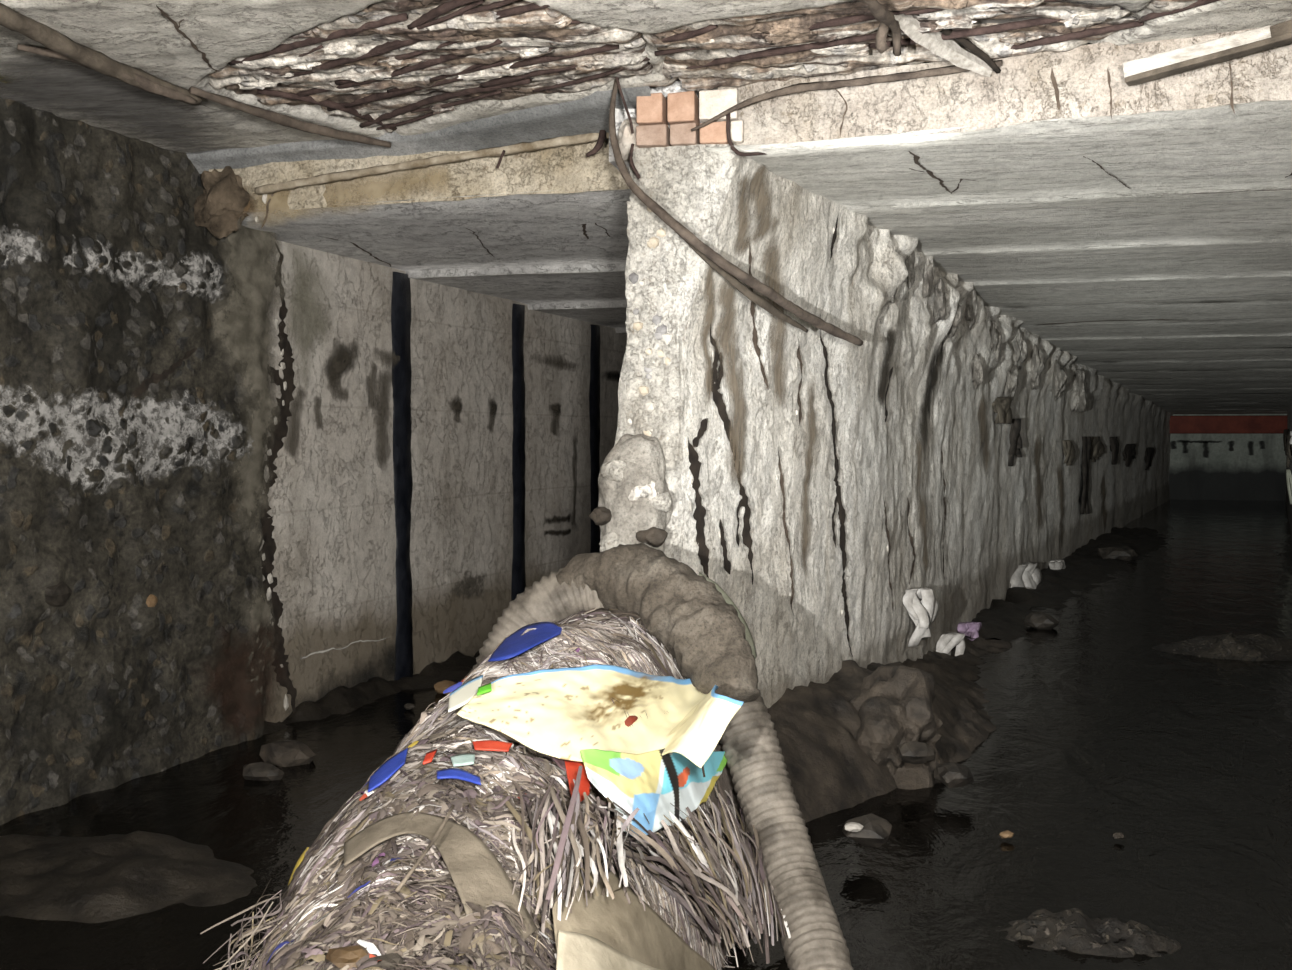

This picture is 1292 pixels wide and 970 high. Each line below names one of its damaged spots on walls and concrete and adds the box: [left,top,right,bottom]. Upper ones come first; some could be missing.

crack [156,5,220,72]
spalling [189,0,1219,471]
crack [830,217,838,260]
water stain [0,385,253,490]
crack [255,193,297,713]
water stain [287,389,322,454]
water stain [328,345,357,400]
water stain [368,353,400,465]
water stain [488,401,497,431]
water stain [545,439,577,535]
crack [687,244,853,657]
crack [883,449,946,617]